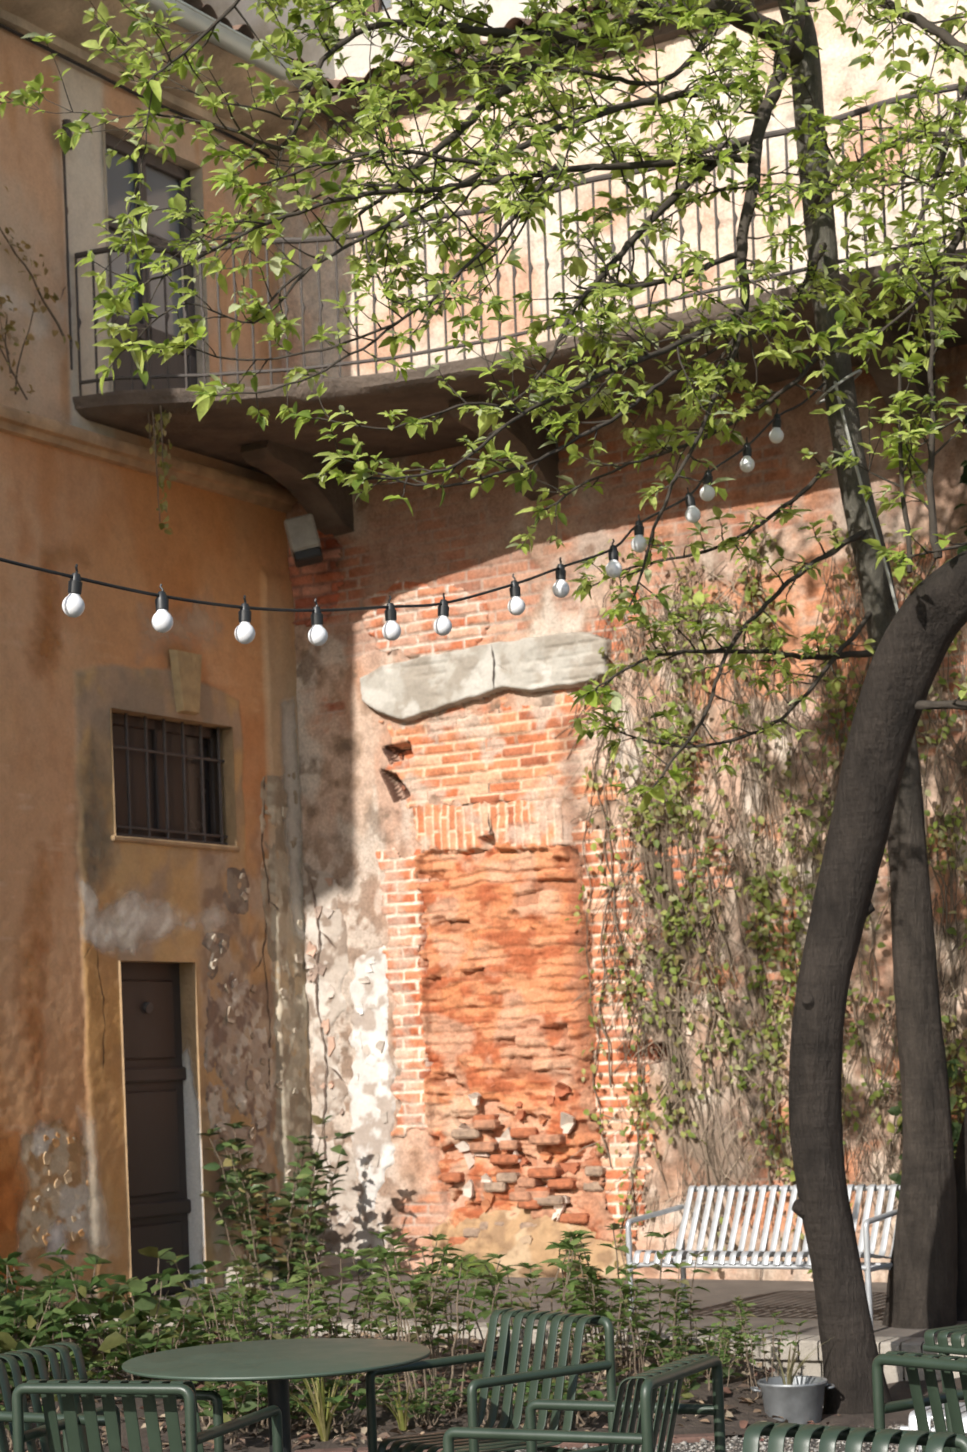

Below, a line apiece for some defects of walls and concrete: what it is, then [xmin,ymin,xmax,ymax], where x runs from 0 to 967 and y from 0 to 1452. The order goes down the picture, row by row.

crack [84,903,105,1073]
spalling [82,690,740,1289]
flaking render [745,887,803,989]
damp [0,1132,22,1295]
peeling [19,1120,94,1261]